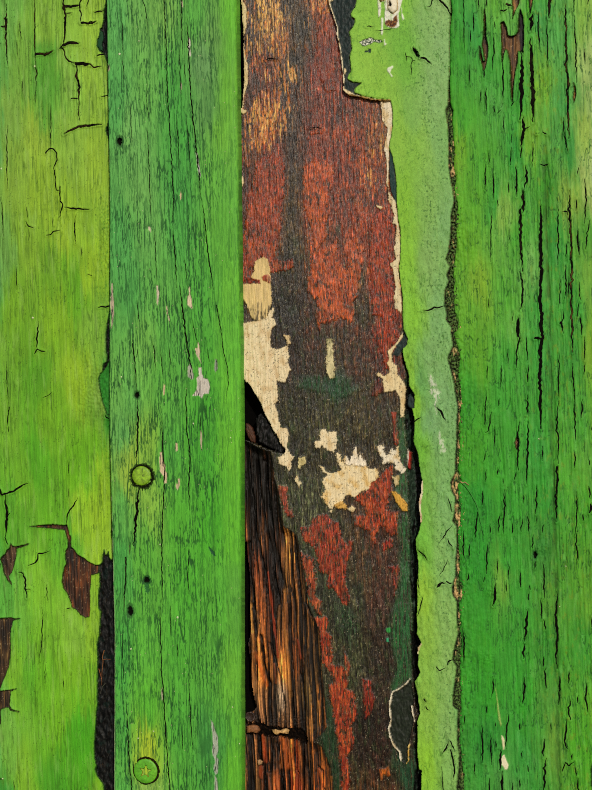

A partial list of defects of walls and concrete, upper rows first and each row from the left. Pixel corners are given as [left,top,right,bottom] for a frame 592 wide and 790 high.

peeling [328,0,391,102]
crack [405,47,430,74]
peeling [479,9,489,72]
peeling [500,0,533,102]
crack [0,0,124,255]
peeling [243,258,273,321]
peeling [394,331,408,357]
crack [414,0,592,790]
peeling [0,543,29,585]
peeling [0,618,21,725]
peeling [30,524,115,790]